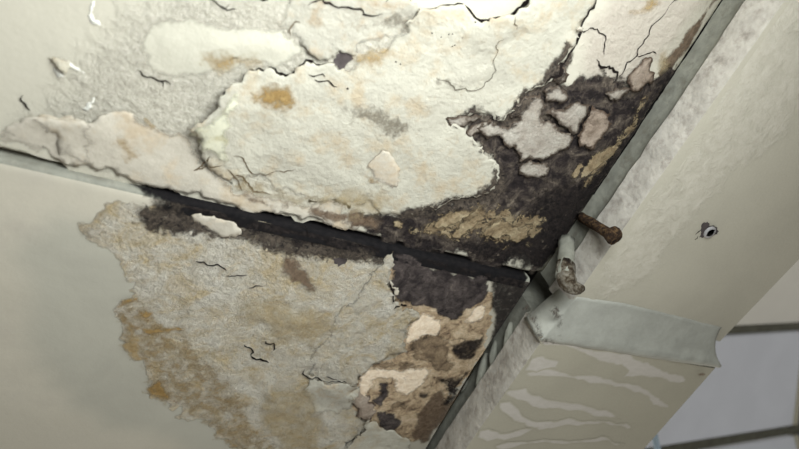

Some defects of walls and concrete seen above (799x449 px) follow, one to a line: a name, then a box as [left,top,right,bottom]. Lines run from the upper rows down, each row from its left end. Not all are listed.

peeling [0,0,618,243]
crack [308,0,388,17]
leakage [135,0,723,343]
crack [427,0,529,91]
crack [539,0,676,90]
peeling [605,57,655,101]
leakage [0,190,384,449]
spalling [304,252,493,449]